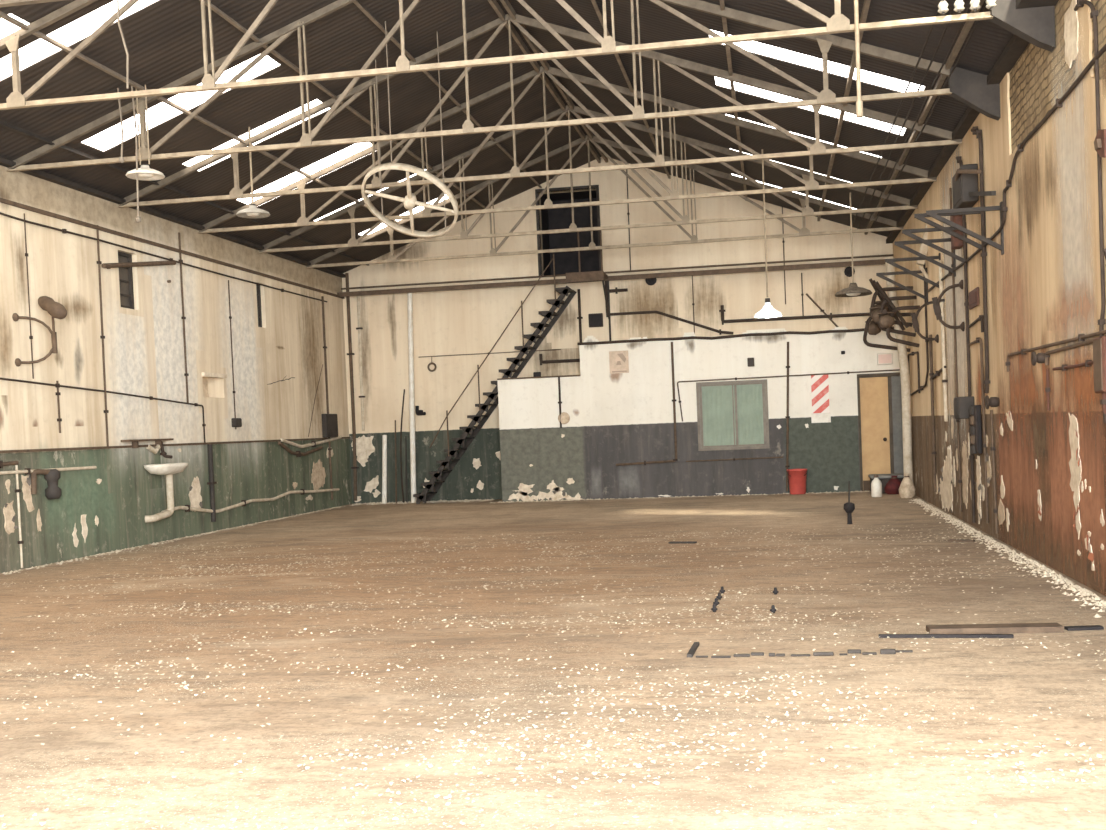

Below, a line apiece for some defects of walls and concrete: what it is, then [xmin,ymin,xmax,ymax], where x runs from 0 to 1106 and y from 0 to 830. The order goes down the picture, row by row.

flaking render [1064,0,1079,68]
leakage [0,175,36,461]
leakage [71,327,88,394]
leakage [275,262,331,481]
leakage [73,416,85,426]
peeling [306,447,334,500]
peeling [349,433,375,467]
peeling [355,475,380,502]
peeling [508,478,583,501]
flaking render [936,411,1013,532]
corrosion [998,269,1106,596]
peeling [1068,413,1105,571]